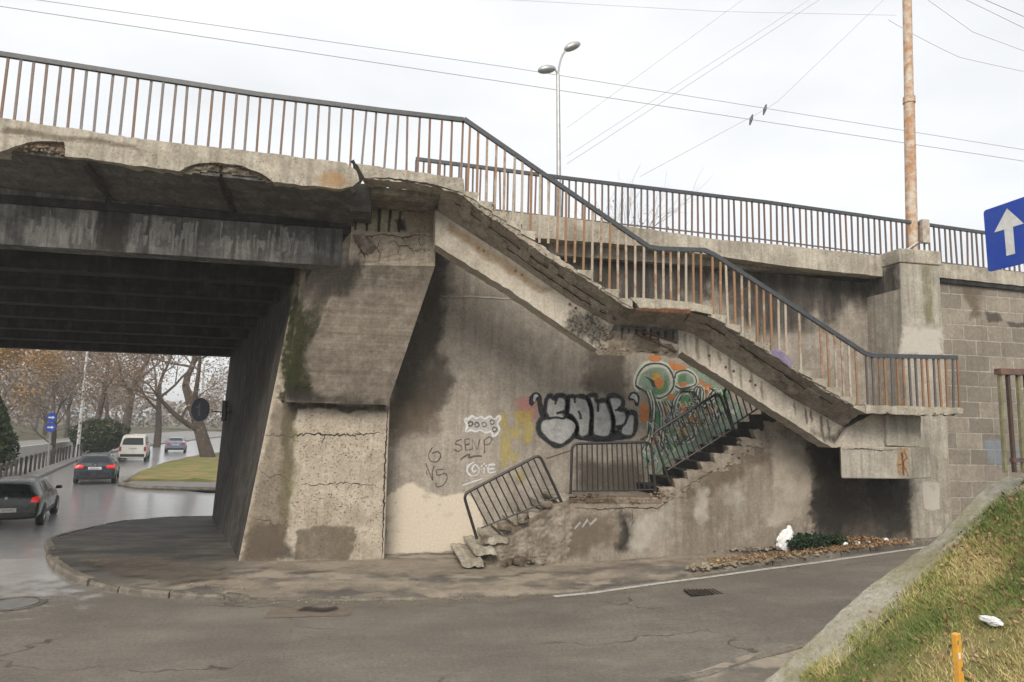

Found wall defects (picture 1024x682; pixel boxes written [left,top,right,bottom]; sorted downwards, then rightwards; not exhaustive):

spalling [13,143,65,156]
spalling [182,163,273,183]
crack [349,160,616,321]
spalling [364,174,678,358]
crack [262,406,389,553]
damp [245,252,455,561]
spalling [480,426,812,566]